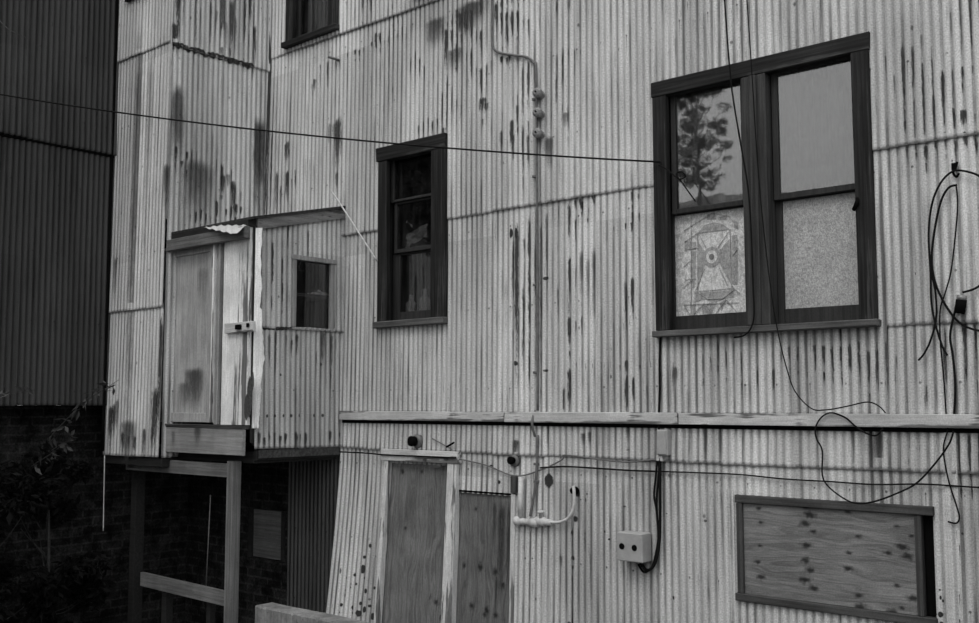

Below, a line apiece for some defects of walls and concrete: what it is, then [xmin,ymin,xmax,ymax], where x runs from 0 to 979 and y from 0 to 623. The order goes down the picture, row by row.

rust [172,0,256,73]
rust [444,10,488,124]
rust [494,0,530,65]
water stain [173,90,182,141]
water stain [254,122,265,190]
rust [264,35,296,215]
rust [500,63,535,171]
rust [885,47,978,173]
rust [190,164,242,226]
rust [510,195,595,383]
rust [625,278,634,315]
rust [619,360,641,411]